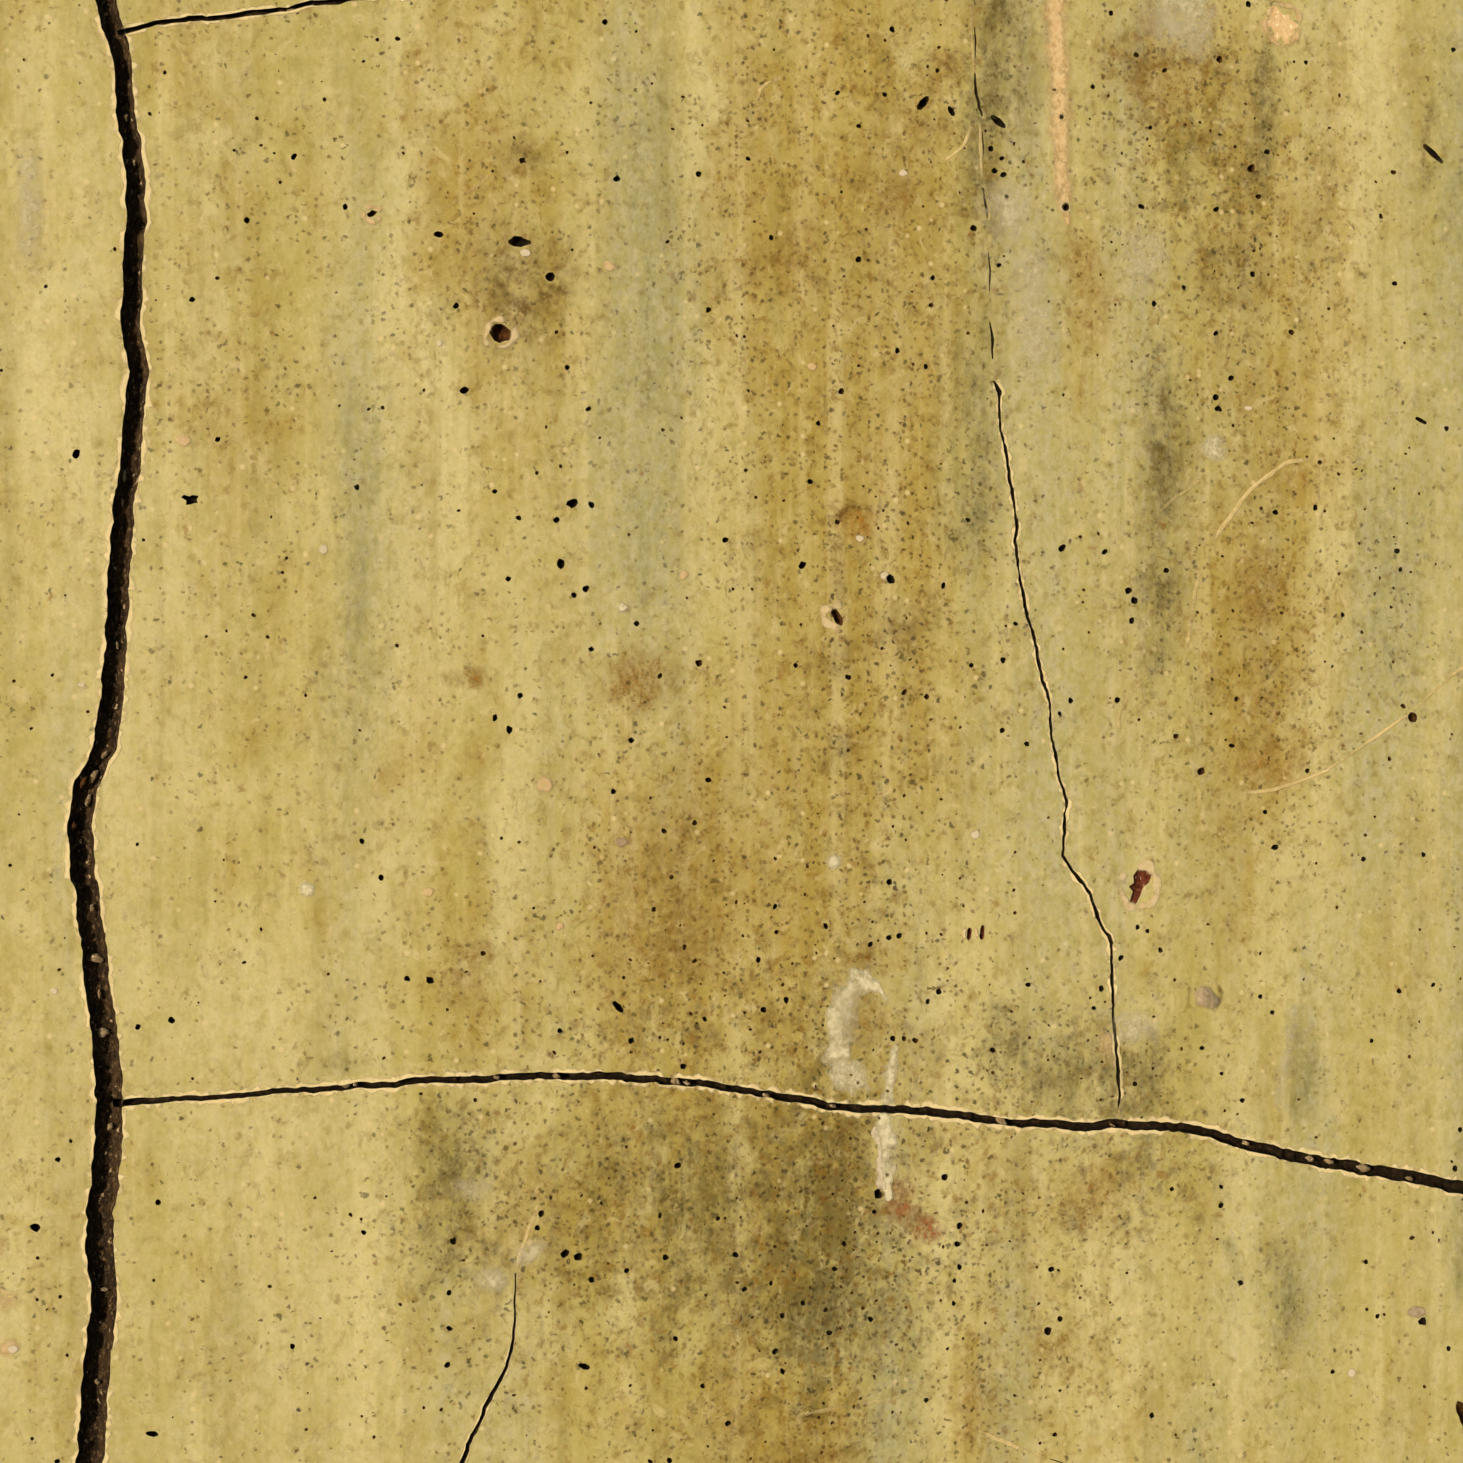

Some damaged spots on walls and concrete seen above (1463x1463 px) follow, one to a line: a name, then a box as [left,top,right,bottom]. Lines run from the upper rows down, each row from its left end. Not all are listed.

crack [945,0,988,218]
crack [985,252,993,292]
crack [987,322,995,359]
crack [1215,459,1304,537]
crack [62,0,355,1463]
crack [993,380,1124,1109]
crack [1248,666,1463,794]
water stain [823,969,887,1094]
crack [113,1068,1463,1197]
water stain [871,1045,898,1201]
crack [459,1212,536,1463]
crack [985,1433,1063,1463]